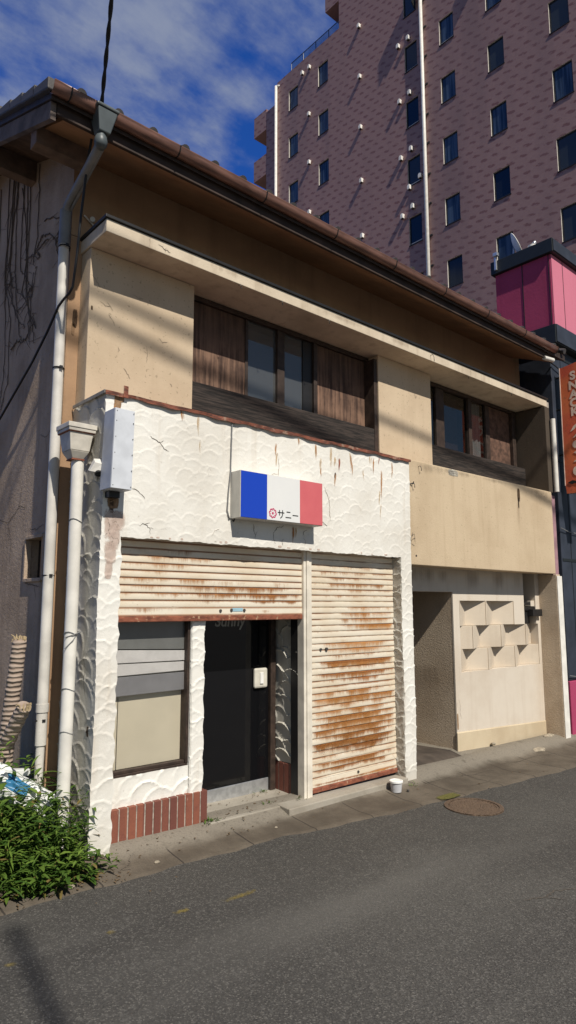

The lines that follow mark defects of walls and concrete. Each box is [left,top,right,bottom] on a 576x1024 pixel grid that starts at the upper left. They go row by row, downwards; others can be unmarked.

rust [138,578,297,603]
rust [316,607,394,785]